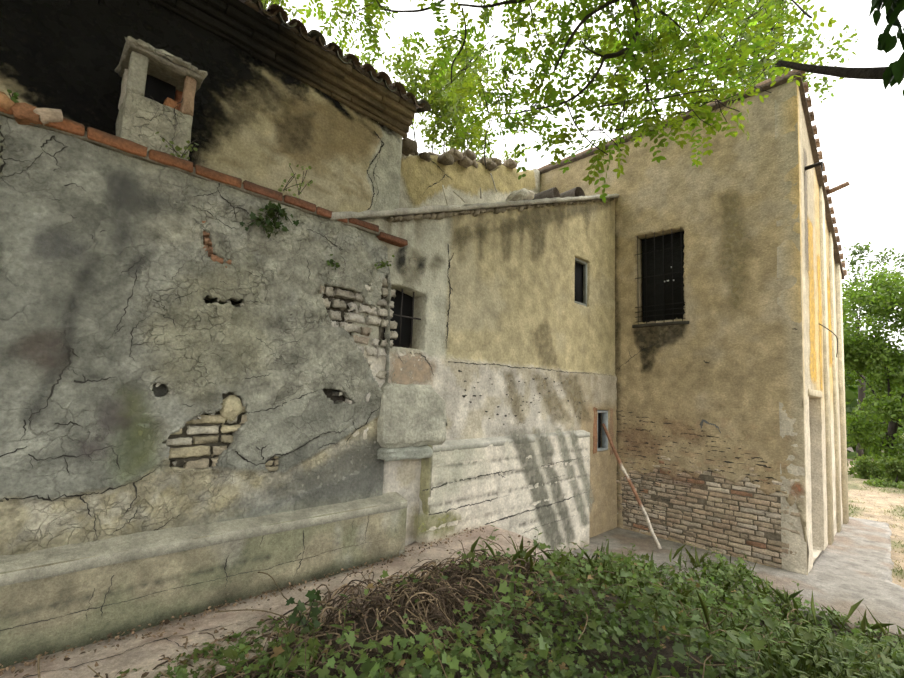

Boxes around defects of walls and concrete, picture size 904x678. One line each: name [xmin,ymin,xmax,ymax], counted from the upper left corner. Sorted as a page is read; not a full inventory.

crack [0,135,83,218]
crack [107,257,198,360]
flaking render [202,221,232,268]
crack [192,183,250,229]
flaking render [203,298,244,307]
flaking render [319,275,432,404]
water stain [804,152,832,389]
crack [0,330,156,538]
flaking render [162,392,247,469]
crack [249,391,316,413]
crack [235,408,379,466]
flaking render [616,410,809,570]